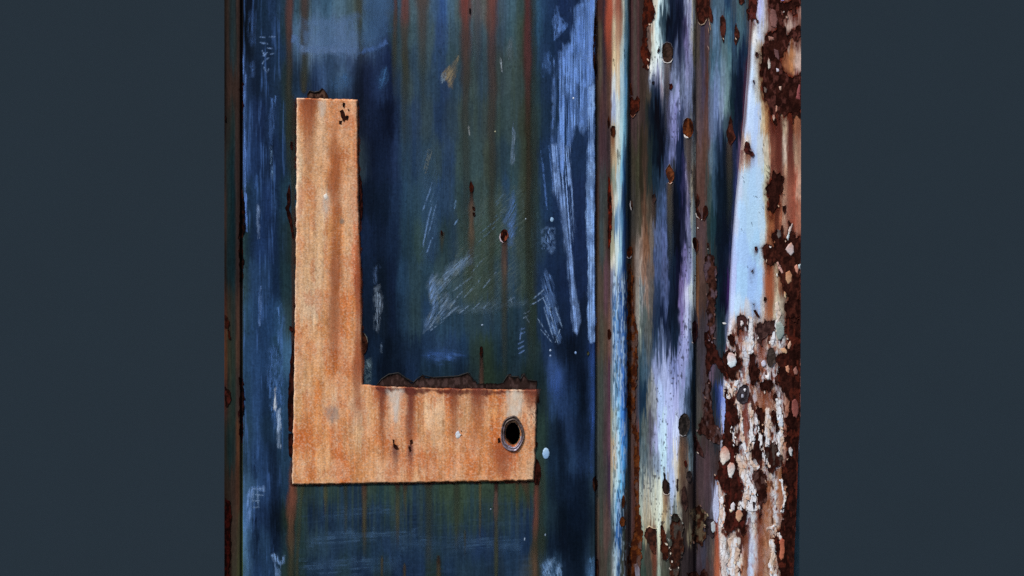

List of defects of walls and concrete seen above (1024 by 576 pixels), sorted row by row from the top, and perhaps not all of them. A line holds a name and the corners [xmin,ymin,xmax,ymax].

corrosion [287,0,314,357]
corrosion [331,253,339,325]
corrosion [355,332,368,379]
corrosion [376,346,535,429]
corrosion [461,0,475,254]
corrosion [487,0,496,195]
corrosion [499,229,508,305]
corrosion [524,0,535,287]
corrosion [619,0,801,576]
peeling [727,316,770,380]
peeling [711,380,799,576]
peeling [769,301,798,375]